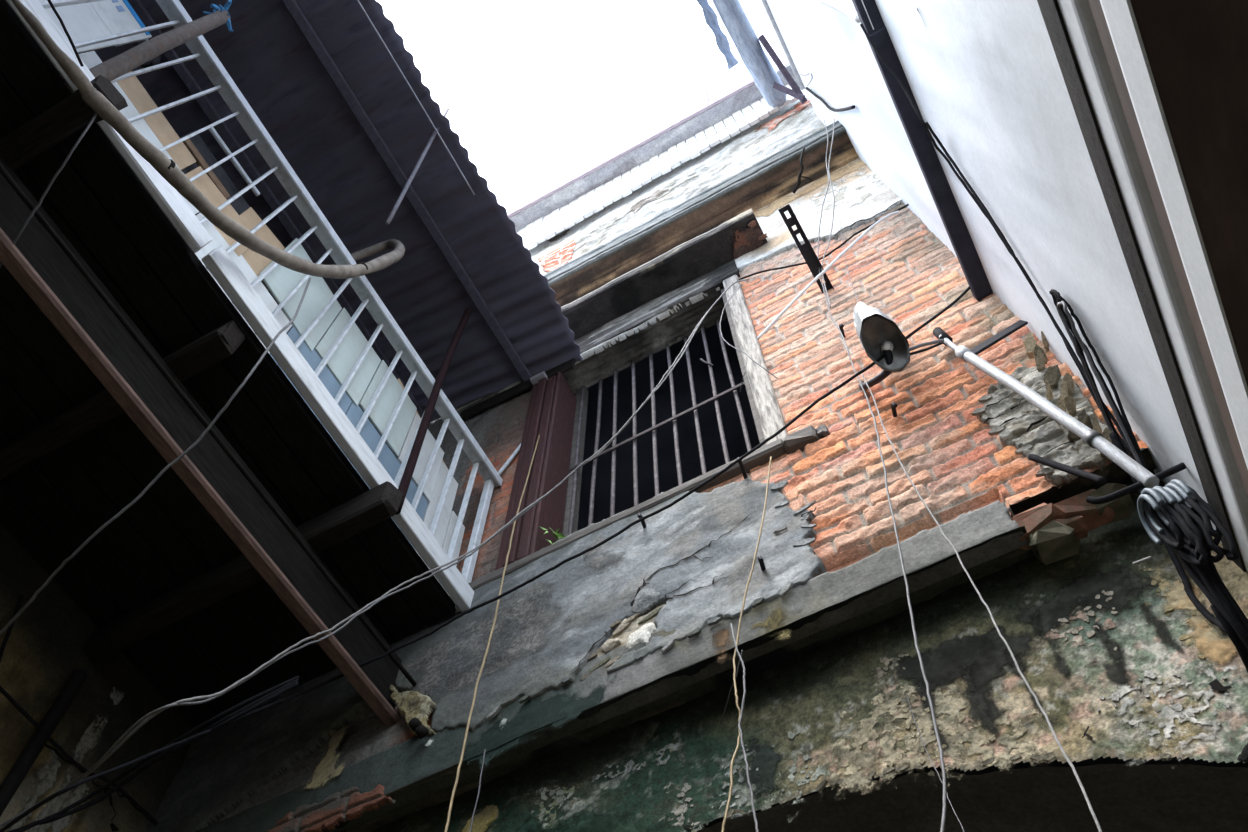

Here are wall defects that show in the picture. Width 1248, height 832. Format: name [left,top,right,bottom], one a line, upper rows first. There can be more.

flaking render [971,331,1114,485]
flaking render [770,480,817,547]
flaking render [561,604,665,684]
leakage [896,566,1183,750]
peeling [1032,562,1248,764]
leakage [8,715,107,832]
flaking render [267,784,395,832]
flaking render [389,685,436,739]
peeling [462,805,498,832]
peeling [531,743,686,829]
peeling [659,783,701,832]
peeling [708,654,1056,820]